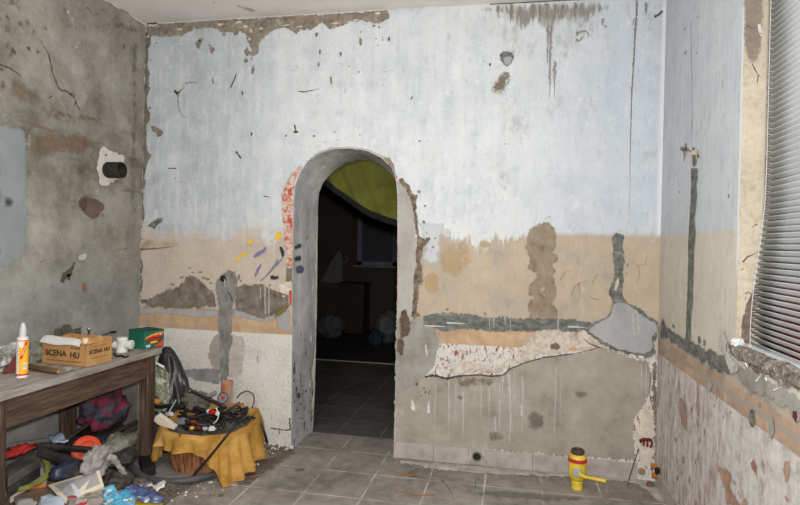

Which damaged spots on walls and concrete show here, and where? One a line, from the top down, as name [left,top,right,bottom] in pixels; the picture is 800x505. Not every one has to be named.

crack [43,46,81,111]
water stain [490,0,607,97]
spalling [104,0,390,228]
spalling [79,196,104,219]
flaking render [281,131,436,318]
spalling [140,250,216,309]
spalling [234,274,292,319]
spalling [394,329,655,468]
spalling [744,362,800,392]